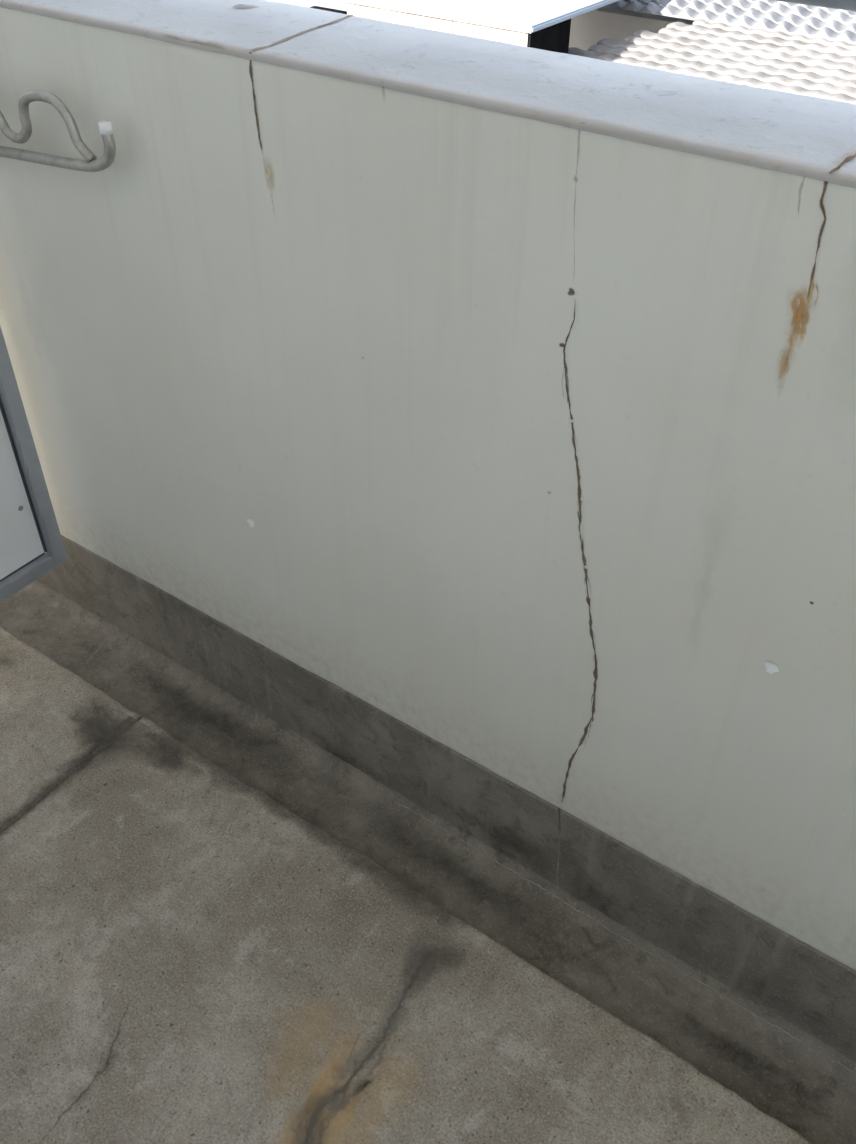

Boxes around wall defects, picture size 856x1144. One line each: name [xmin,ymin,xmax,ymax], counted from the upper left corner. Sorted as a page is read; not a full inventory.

crack [249,14,353,153]
crack [803,154,856,306]
rust [781,283,818,373]
crack [370,298,856,1074]